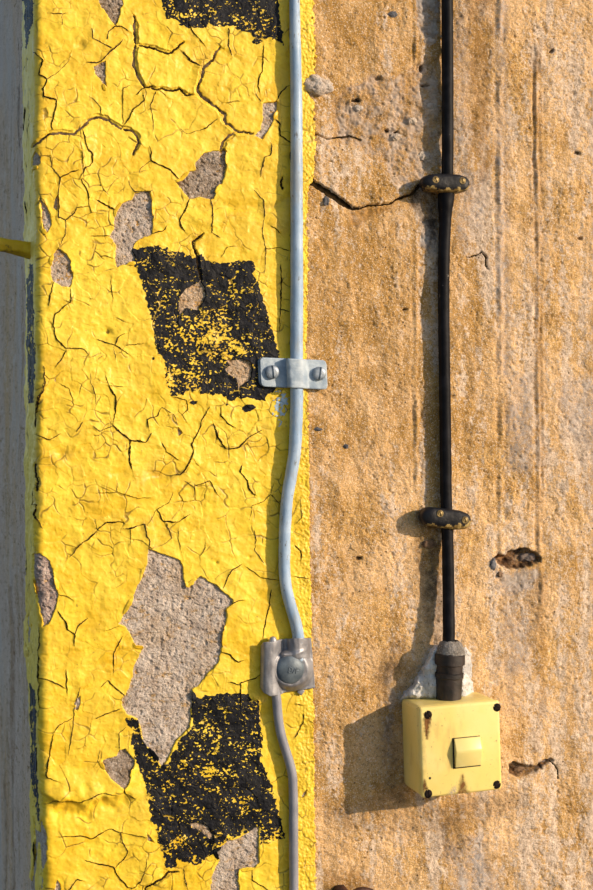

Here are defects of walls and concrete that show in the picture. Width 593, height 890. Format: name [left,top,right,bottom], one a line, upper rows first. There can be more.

peeling [110,191,155,267]
crack [23,16,291,331]
peeling [176,150,229,199]
crack [310,181,420,210]
crack [34,282,309,636]
peeling [33,553,59,626]
crack [58,595,88,646]
spalling [490,548,540,593]
peeling [119,549,233,766]
crack [26,626,135,803]
crack [63,829,188,890]
peeling [190,822,259,890]